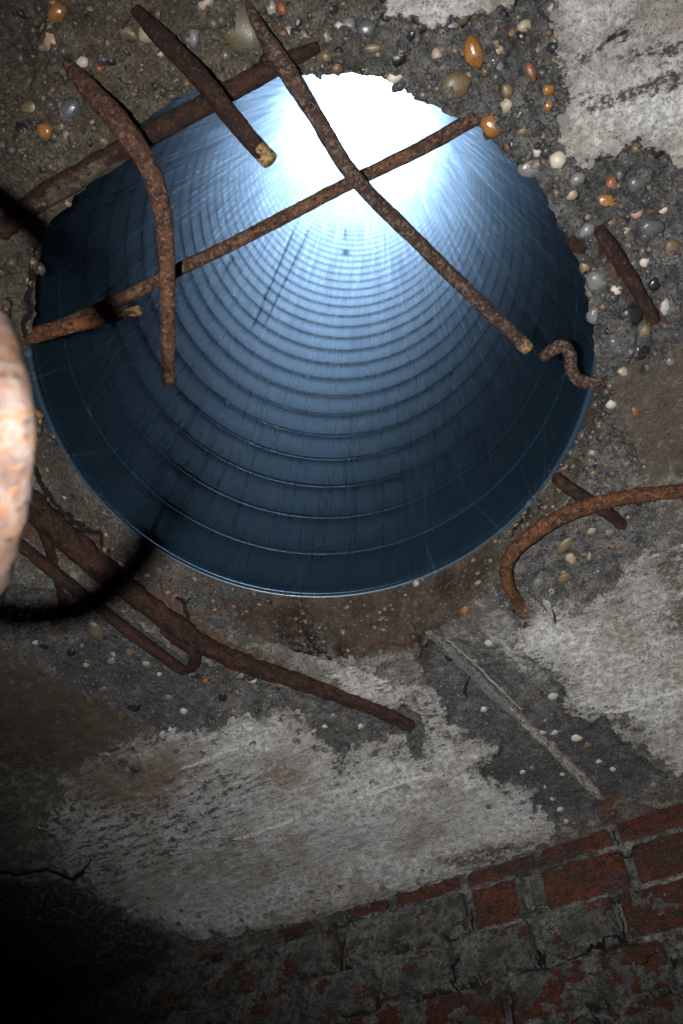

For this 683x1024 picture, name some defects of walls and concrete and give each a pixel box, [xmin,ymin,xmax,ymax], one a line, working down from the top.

spalling [0,0,683,805]
rust [234,541,494,669]
crack [0,858,92,882]
peeling [458,877,559,1009]
crack [545,909,659,969]
peeling [530,873,683,1024]